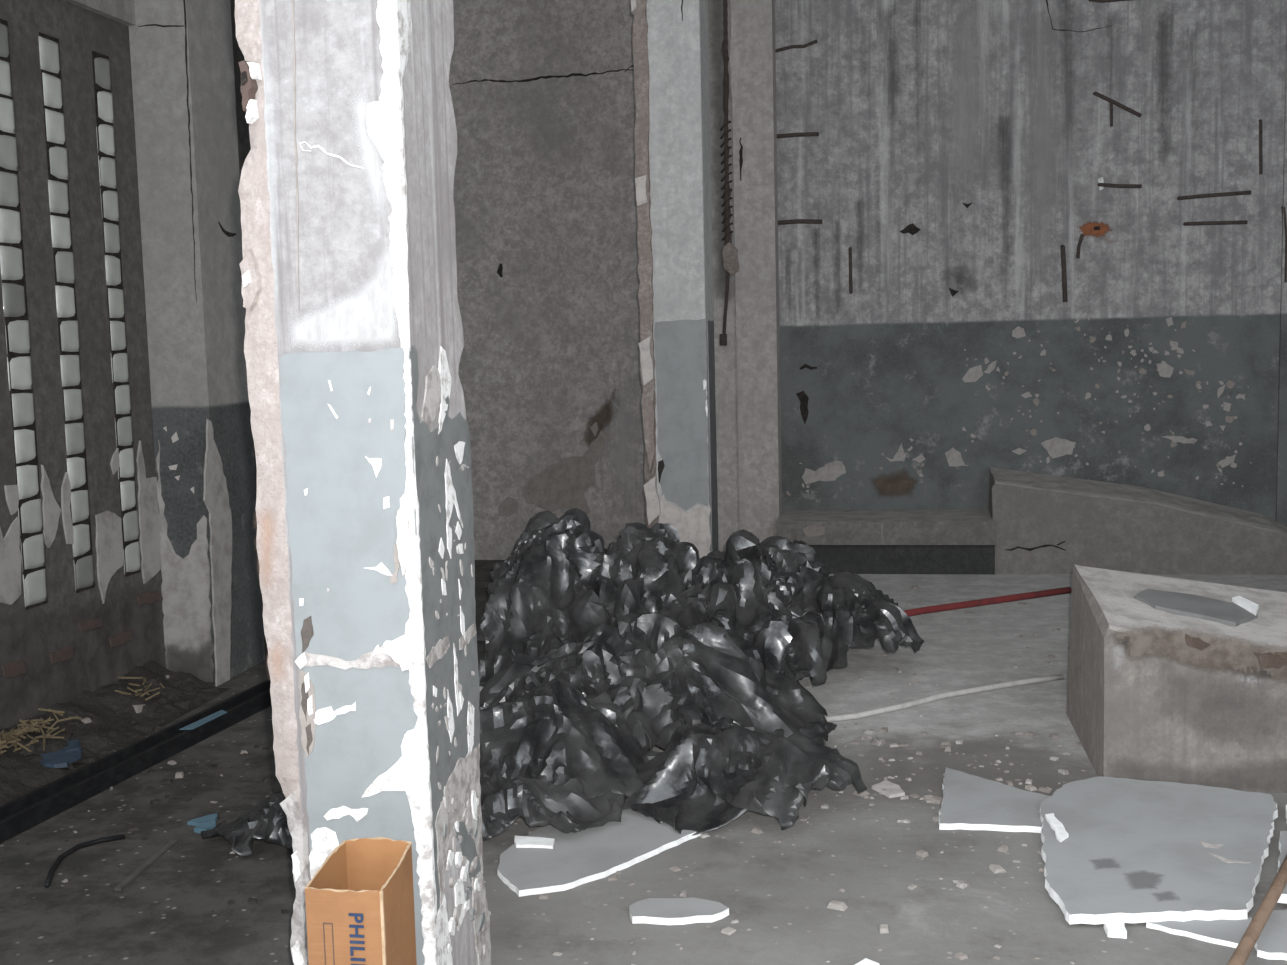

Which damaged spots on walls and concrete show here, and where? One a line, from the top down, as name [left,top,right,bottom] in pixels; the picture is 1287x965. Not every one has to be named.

crack [452,65,634,85]
rust [1079,221,1112,236]
peeling [962,326,1089,466]
peeling [1074,313,1249,477]
flaking render [0,485,22,605]
flaking render [41,465,74,548]
flaking render [95,511,123,604]
peeling [136,419,232,687]
peeling [280,0,491,965]
peeling [879,438,925,477]
peeling [945,427,976,469]
peeling [1215,442,1252,487]